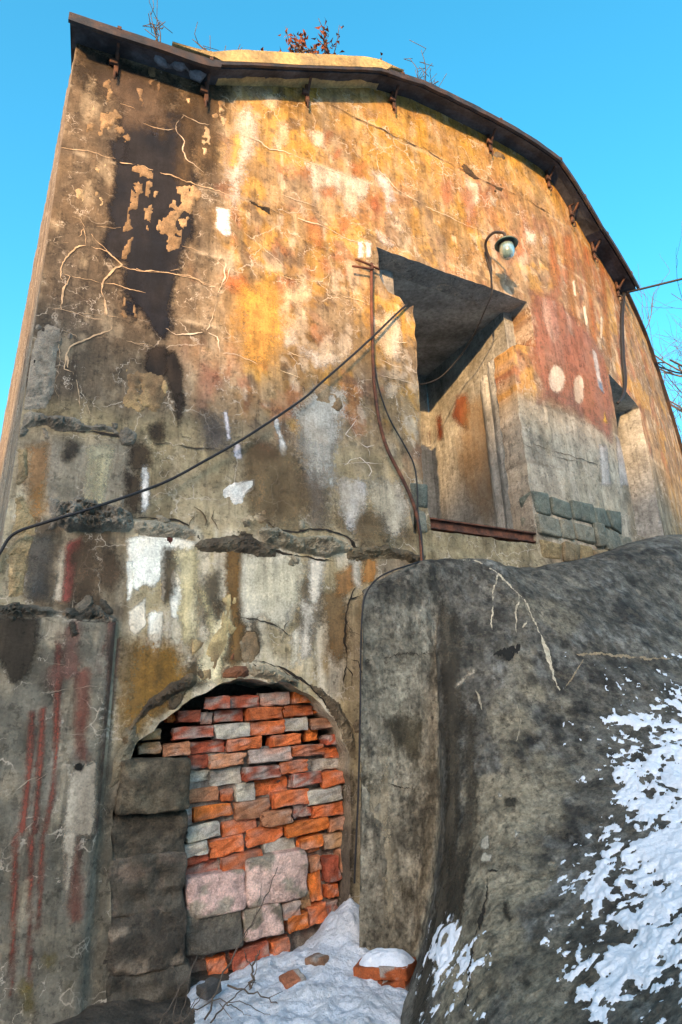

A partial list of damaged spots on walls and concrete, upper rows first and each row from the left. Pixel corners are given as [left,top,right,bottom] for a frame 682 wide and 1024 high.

flaking render [86,79,130,142]
flaking render [137,67,160,104]
flaking render [202,99,228,155]
flaking render [76,188,103,206]
flaking render [122,165,202,259]
water stain [74,44,257,517]
crack [54,103,356,437]
spalling [0,322,137,638]
spalling [194,510,279,558]
crack [463,559,673,691]
spalling [110,593,359,787]
spalling [279,953,329,989]